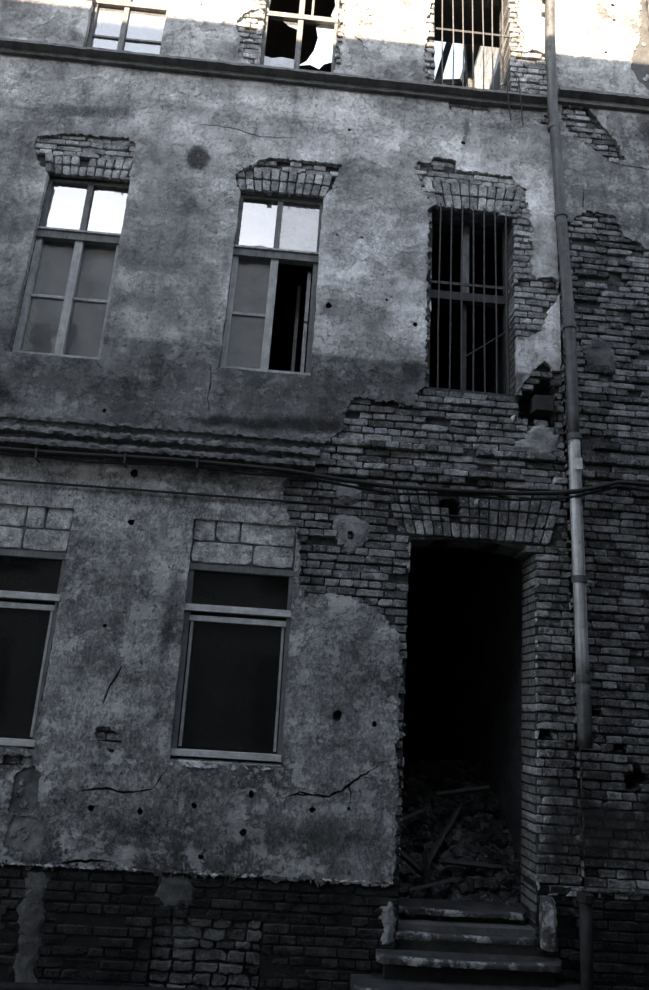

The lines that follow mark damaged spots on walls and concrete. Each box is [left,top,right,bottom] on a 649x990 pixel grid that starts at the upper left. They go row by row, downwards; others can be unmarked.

flaking render [236,0,267,64]
flaking render [423,0,436,83]
flaking render [500,0,547,95]
peeling [631,0,649,90]
flaking render [35,135,135,183]
flaking render [236,160,339,200]
flaking render [561,109,624,163]
flaking render [282,160,649,902]
crack [82,769,167,794]
crack [282,766,378,803]